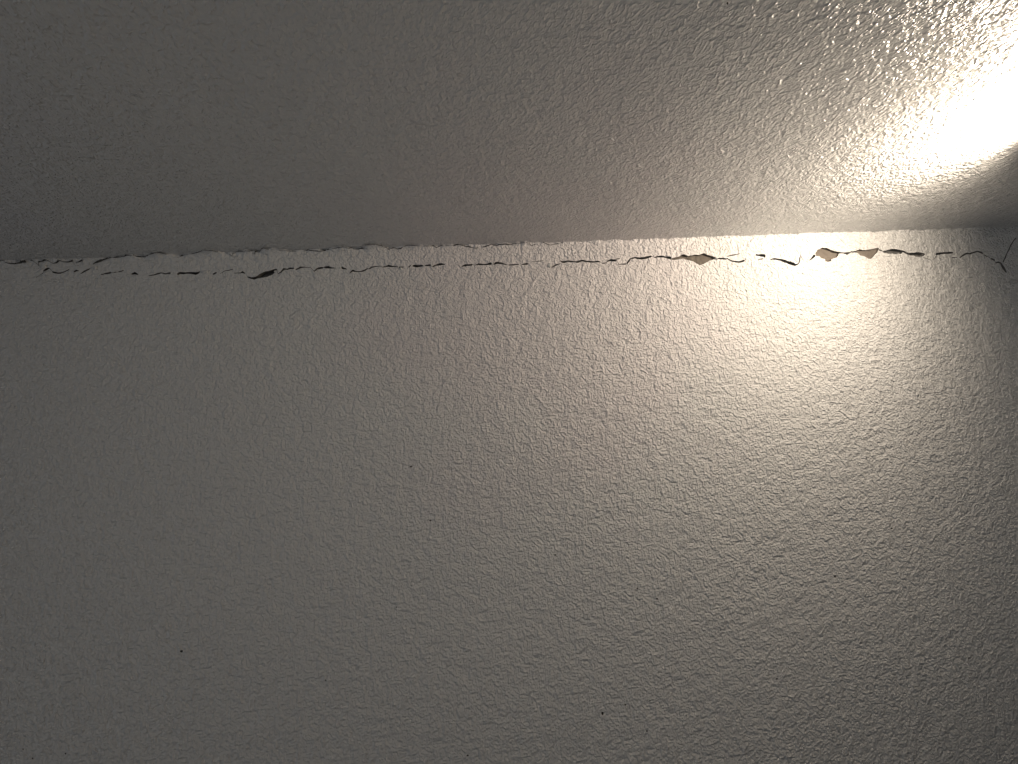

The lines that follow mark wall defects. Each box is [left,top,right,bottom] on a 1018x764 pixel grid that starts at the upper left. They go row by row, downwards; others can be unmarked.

crack [4,242,671,279]
flaking render [671,253,714,265]
flaking render [816,248,839,262]
crack [713,238,1016,273]
flaking render [856,248,905,259]